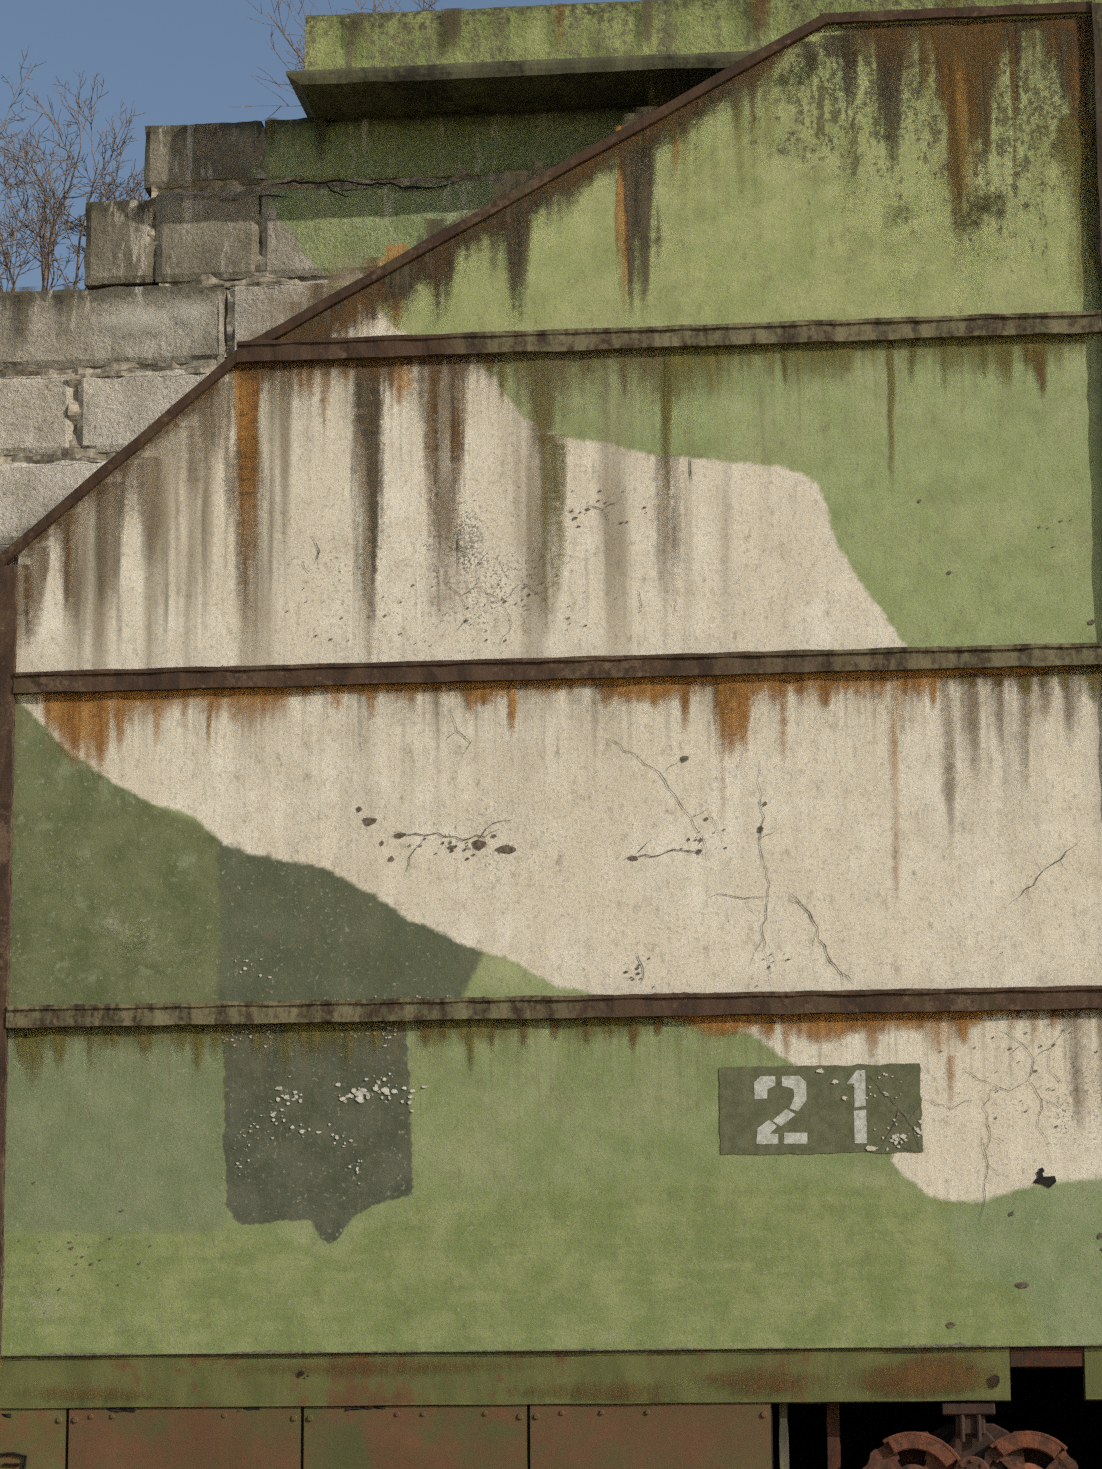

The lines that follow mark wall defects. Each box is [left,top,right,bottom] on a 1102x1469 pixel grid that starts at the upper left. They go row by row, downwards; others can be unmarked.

corrosion [1060,116,1100,283]
corrosion [233,355,494,585]
corrosion [658,358,678,563]
corrosion [61,514,72,592]
corrosion [45,666,1102,763]
spalling [380,833,516,861]
crack [397,819,512,876]
crack [611,739,722,860]
crack [711,763,852,984]
peeling [816,1068,902,1104]
peeling [865,1119,925,1151]
crack [870,1028,1067,1219]